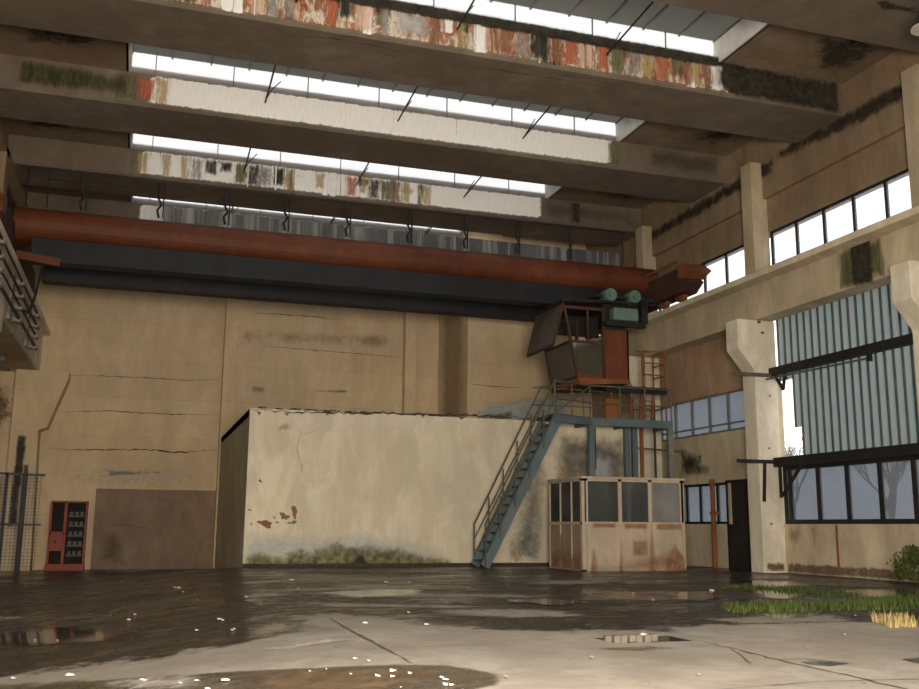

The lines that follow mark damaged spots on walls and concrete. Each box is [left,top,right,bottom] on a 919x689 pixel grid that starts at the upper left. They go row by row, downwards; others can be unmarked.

water stain [31,29,94,45]
water stain [334,0,902,156]
water stain [22,62,619,164]
water stain [652,178,741,239]
water stain [851,241,872,285]
peeling [250,506,297,529]
water stain [0,542,919,677]
water stain [83,665,497,689]
crack [330,618,420,663]
crack [697,640,907,689]